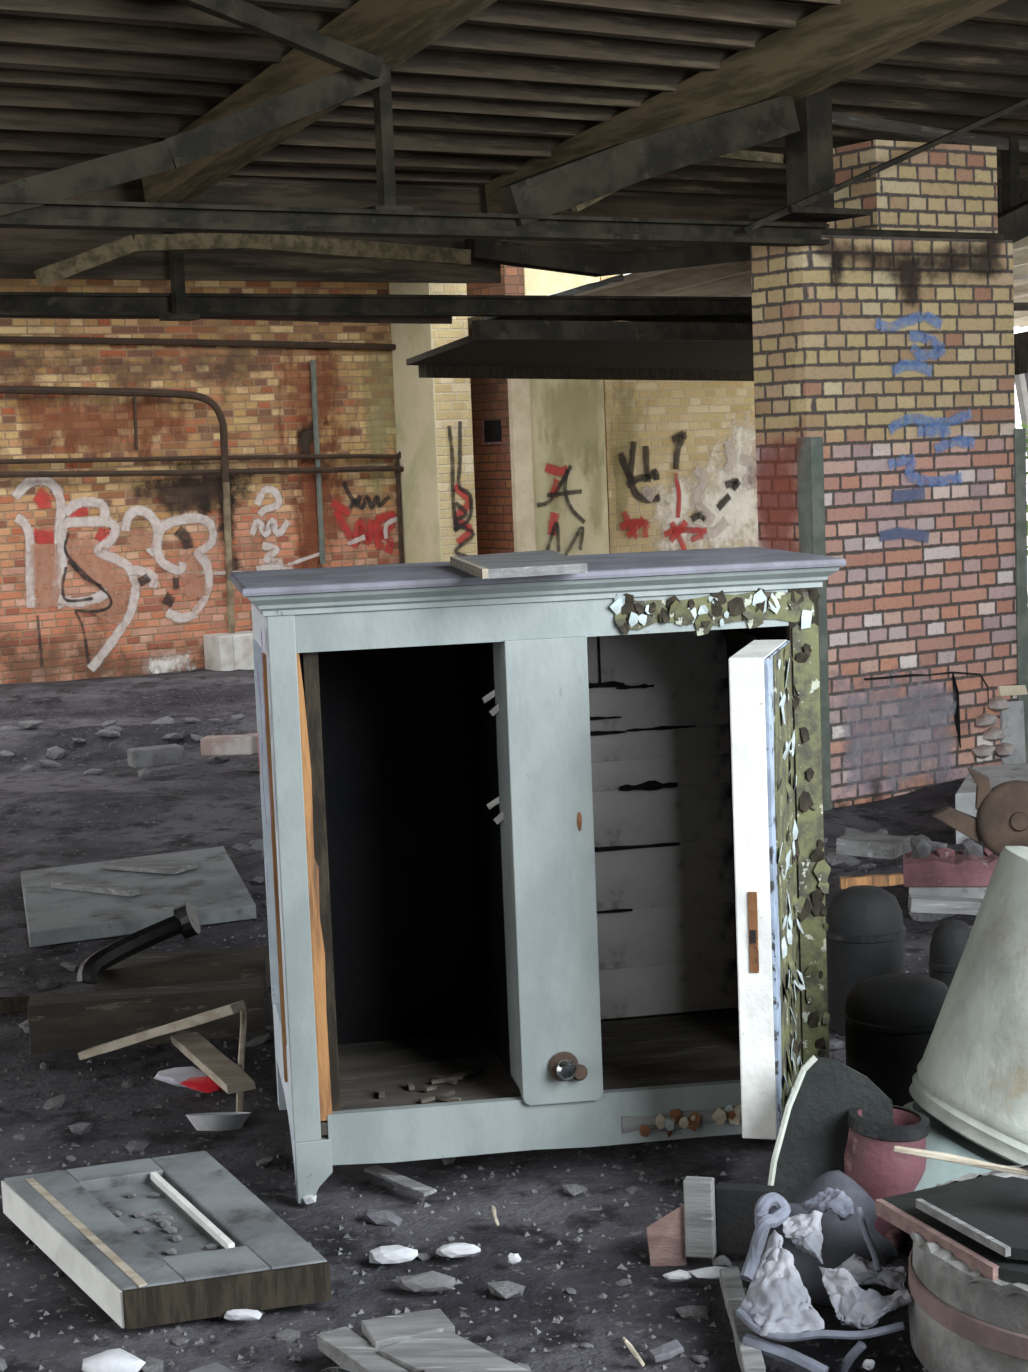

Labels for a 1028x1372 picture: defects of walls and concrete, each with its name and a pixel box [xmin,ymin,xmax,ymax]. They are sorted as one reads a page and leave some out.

water stain [833,255,842,286]
water stain [901,261,920,305]
peeling [655,421,759,551]